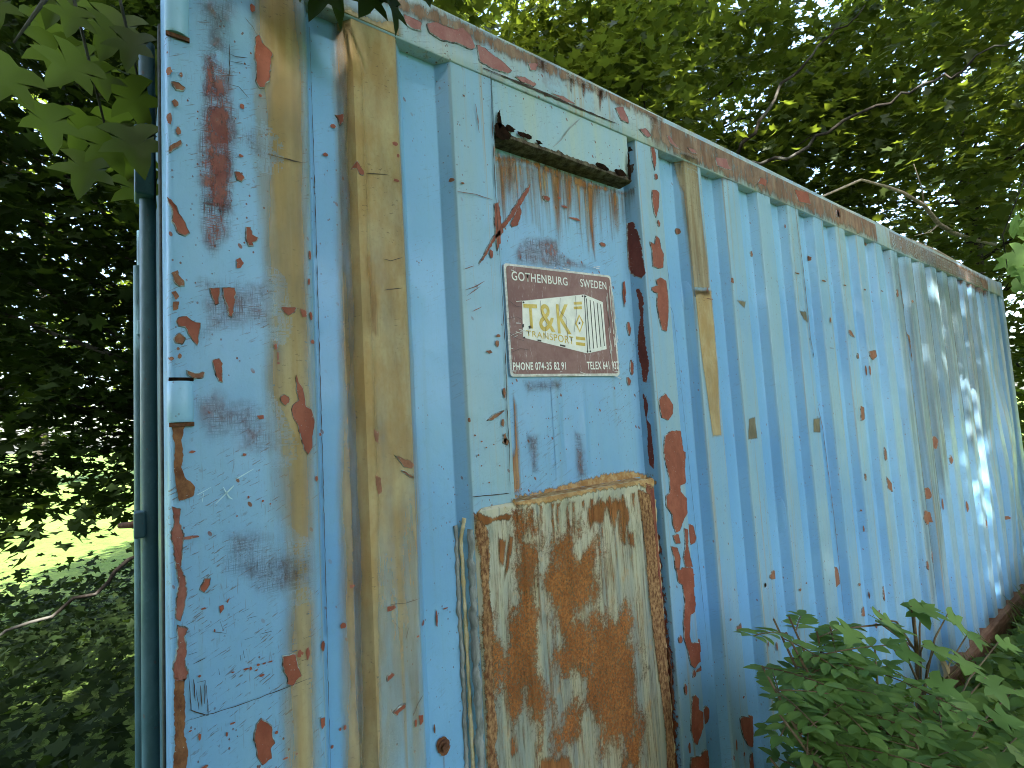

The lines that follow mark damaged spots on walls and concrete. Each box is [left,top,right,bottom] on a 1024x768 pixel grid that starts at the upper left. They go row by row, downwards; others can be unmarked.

peeling [254,35,273,97]
peeling [403,14,538,87]
peeling [167,197,190,237]
peeling [479,184,530,264]
rust [387,0,988,356]
peeling [794,189,811,205]
peeling [280,375,321,454]
peeling [474,388,509,467]
peeling [615,106,710,768]
peeling [169,506,211,681]
rust [474,401,681,768]